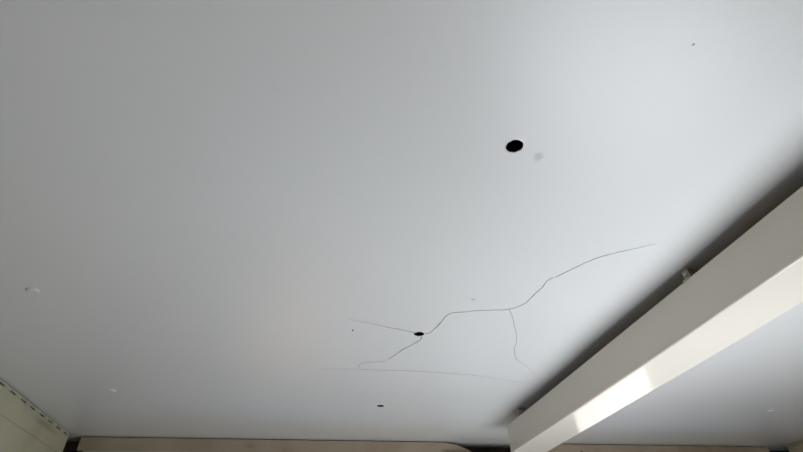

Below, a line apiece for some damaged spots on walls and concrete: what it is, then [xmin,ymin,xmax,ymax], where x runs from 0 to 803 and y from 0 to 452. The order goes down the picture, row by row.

crack [354,244,653,384]